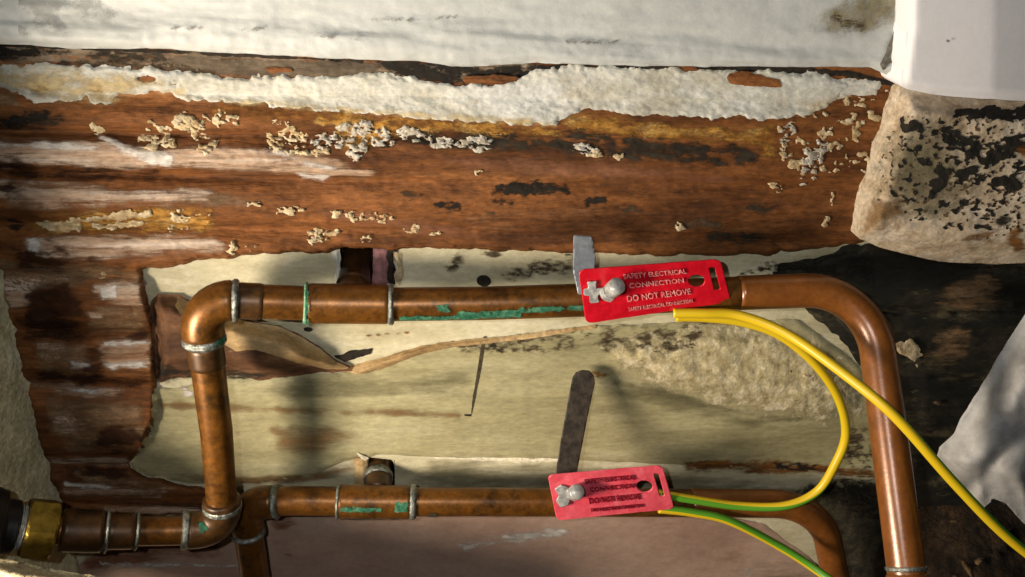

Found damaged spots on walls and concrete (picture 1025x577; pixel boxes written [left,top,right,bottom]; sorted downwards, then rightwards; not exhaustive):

damp [827,0,896,32]
damp [0,46,538,102]
damp [0,110,64,131]
corrosion [211,104,774,157]
damp [380,115,759,166]
corrosion [451,159,663,179]
mould [877,104,1025,239]
flaking render [0,46,891,516]
corrosion [685,460,875,478]